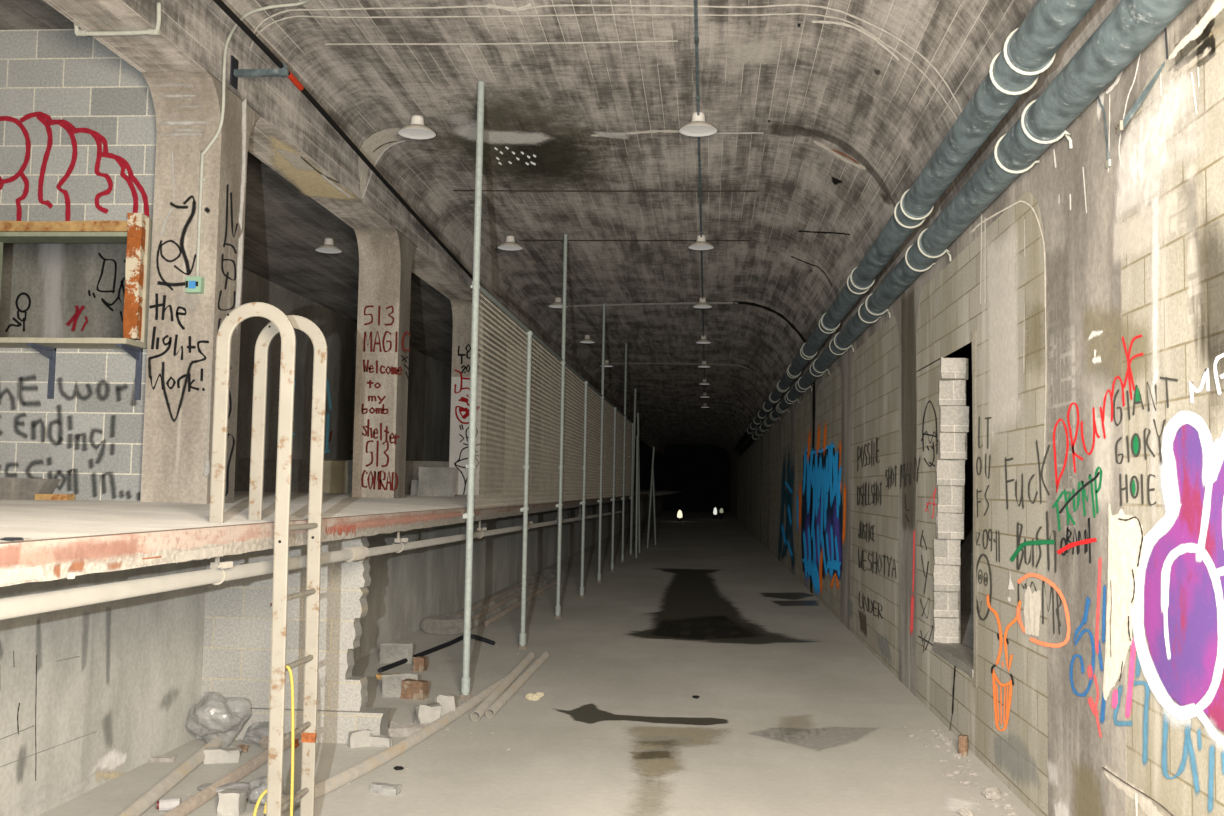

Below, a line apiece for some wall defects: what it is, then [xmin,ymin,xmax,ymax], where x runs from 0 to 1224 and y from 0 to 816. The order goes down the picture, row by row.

water stain [1197,223,1224,369]
water stain [630,568,817,644]
water stain [557,704,727,776]
spalling [1102,766,1174,816]